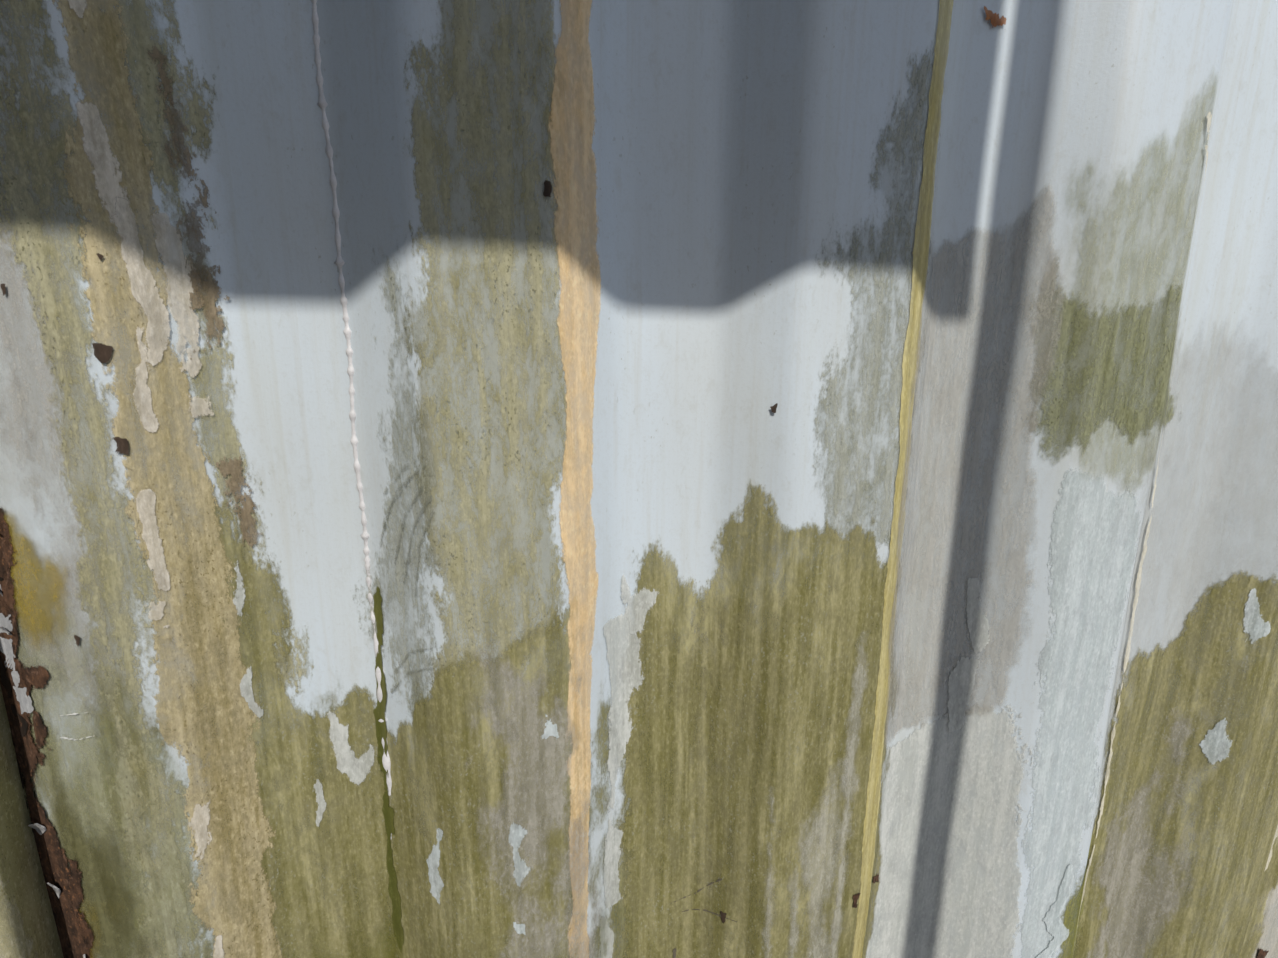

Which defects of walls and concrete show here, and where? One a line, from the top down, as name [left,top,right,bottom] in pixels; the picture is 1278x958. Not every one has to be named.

corrosion [92,343,113,363]
corrosion [113,437,129,455]
leakage [484,0,601,958]
leakage [790,0,1139,958]
corrosion [0,518,63,638]
peeling [947,578,990,732]
corrosion [0,656,51,810]
peeling [1036,864,1074,958]
leakage [1095,794,1177,958]